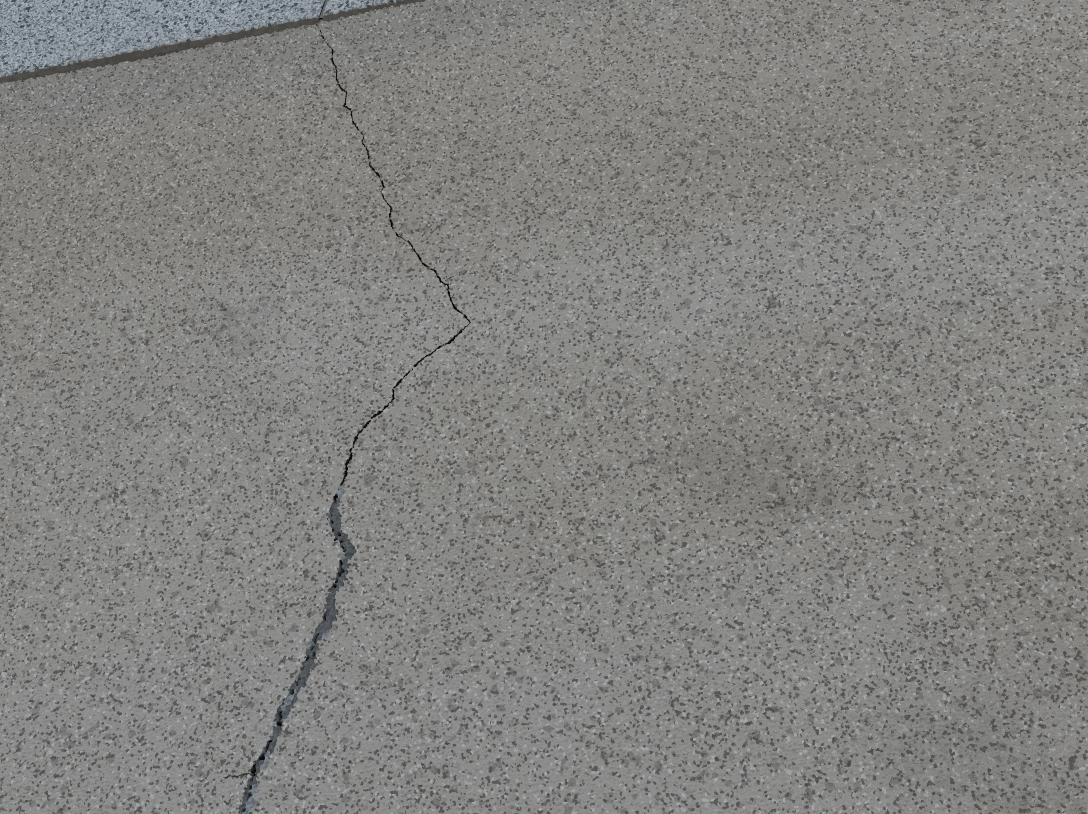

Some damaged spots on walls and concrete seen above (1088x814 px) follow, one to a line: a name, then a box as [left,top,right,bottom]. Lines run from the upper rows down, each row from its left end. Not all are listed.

crack [223,24,471,814]